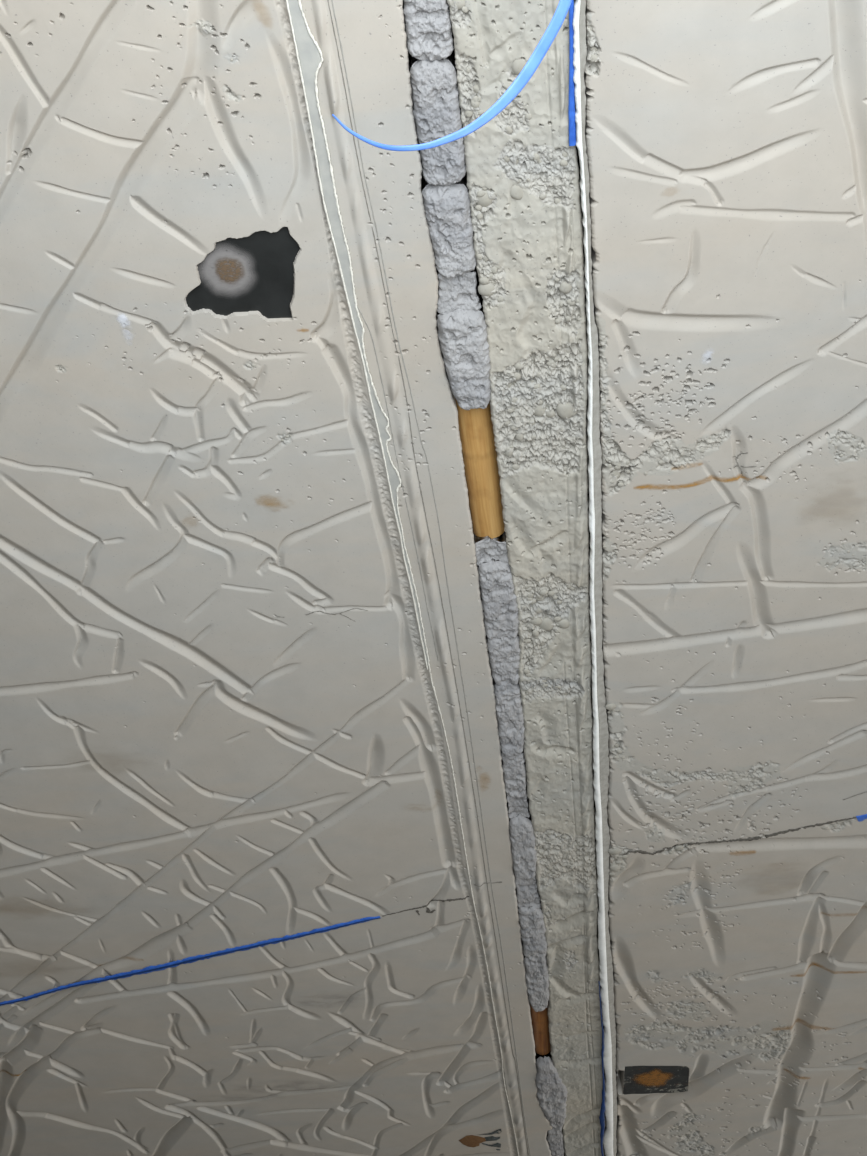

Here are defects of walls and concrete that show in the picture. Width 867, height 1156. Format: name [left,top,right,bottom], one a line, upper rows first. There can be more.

crack [605,459,638,473]
crack [734,452,757,476]
crack [275,608,368,621]
crack [622,792,866,855]
crack [382,881,502,917]
rust [635,1070,671,1086]
rust [459,1129,502,1151]